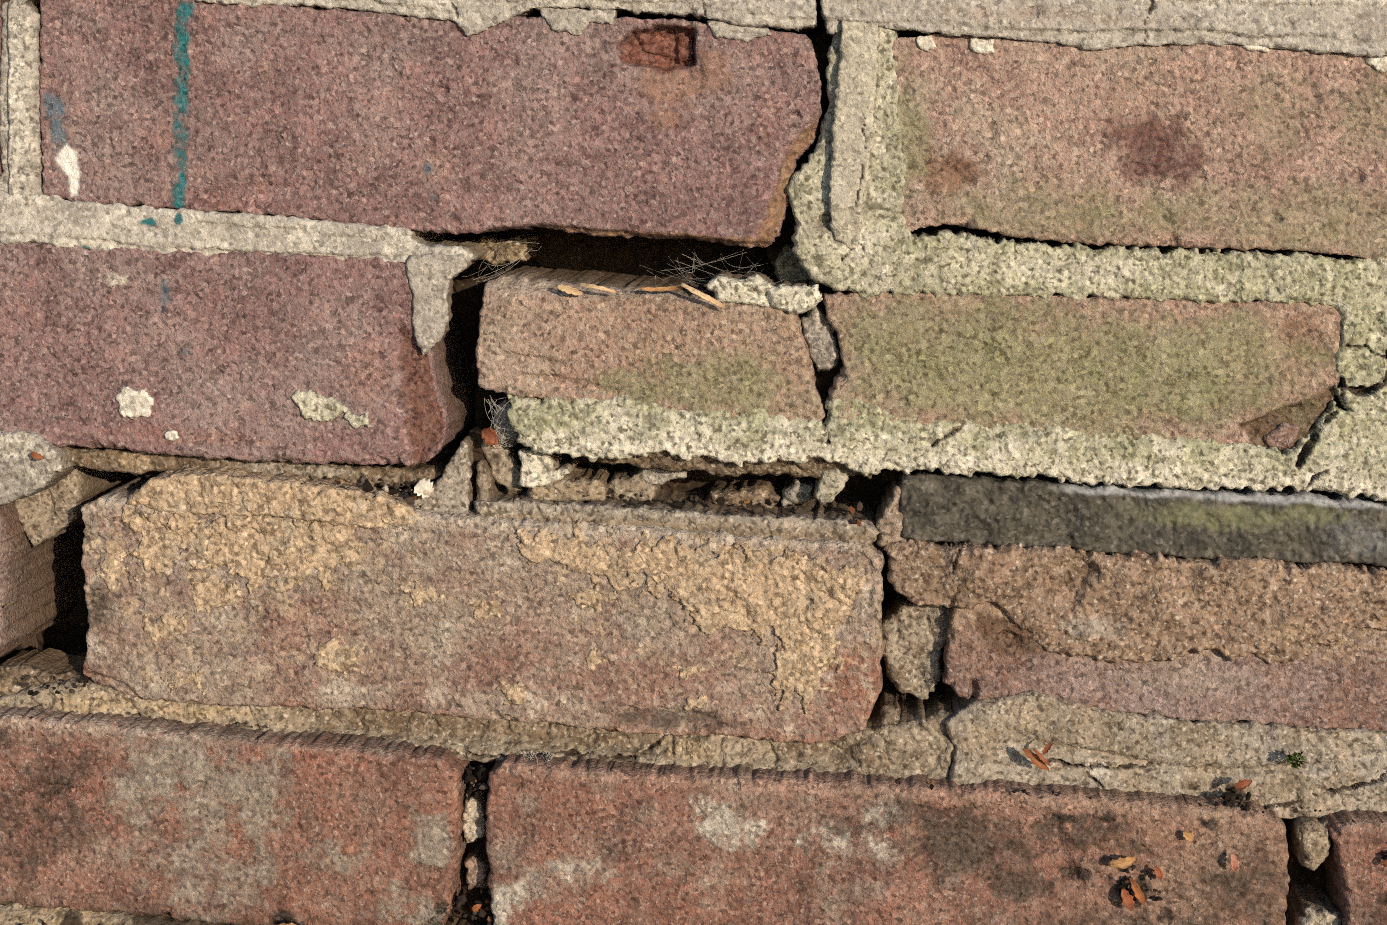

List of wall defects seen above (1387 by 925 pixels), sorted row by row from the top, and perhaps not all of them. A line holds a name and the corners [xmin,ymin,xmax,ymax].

peeling [0,116,819,664]
crack [931,424,963,447]
crack [1271,344,1387,494]
peeling [835,473,889,511]
crack [879,469,900,485]
peeling [882,548,896,607]
peeling [509,519,866,715]
spalling [976,613,1041,656]
peeling [314,634,368,679]
peeling [882,656,895,690]
crack [1047,758,1160,789]
crack [1264,771,1387,809]